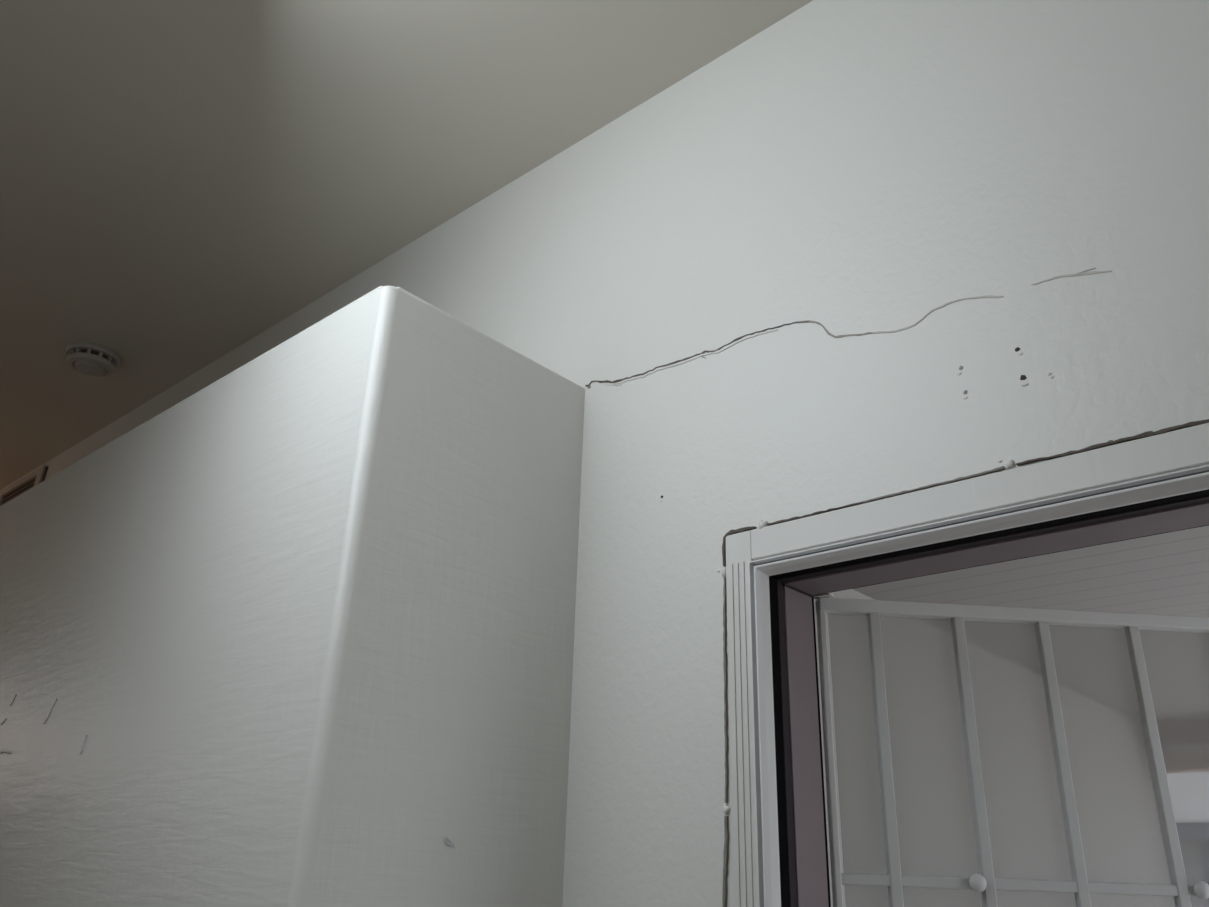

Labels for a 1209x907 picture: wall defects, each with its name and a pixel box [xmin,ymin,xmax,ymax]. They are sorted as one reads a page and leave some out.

crack [1031,267,1111,285]
crack [585,295,1003,389]
crack [721,419,1209,907]